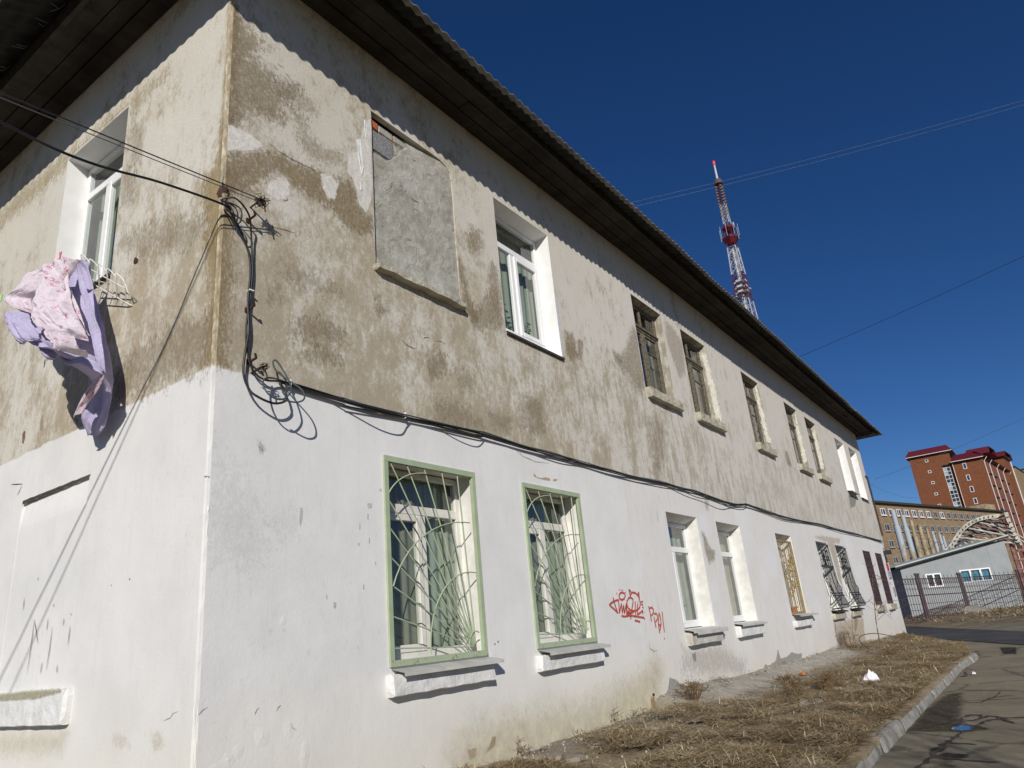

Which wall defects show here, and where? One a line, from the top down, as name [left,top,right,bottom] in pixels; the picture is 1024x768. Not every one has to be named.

water stain [0,67,170,229]
water stain [200,8,374,368]
peeling [357,119,367,190]
water stain [565,331,583,361]